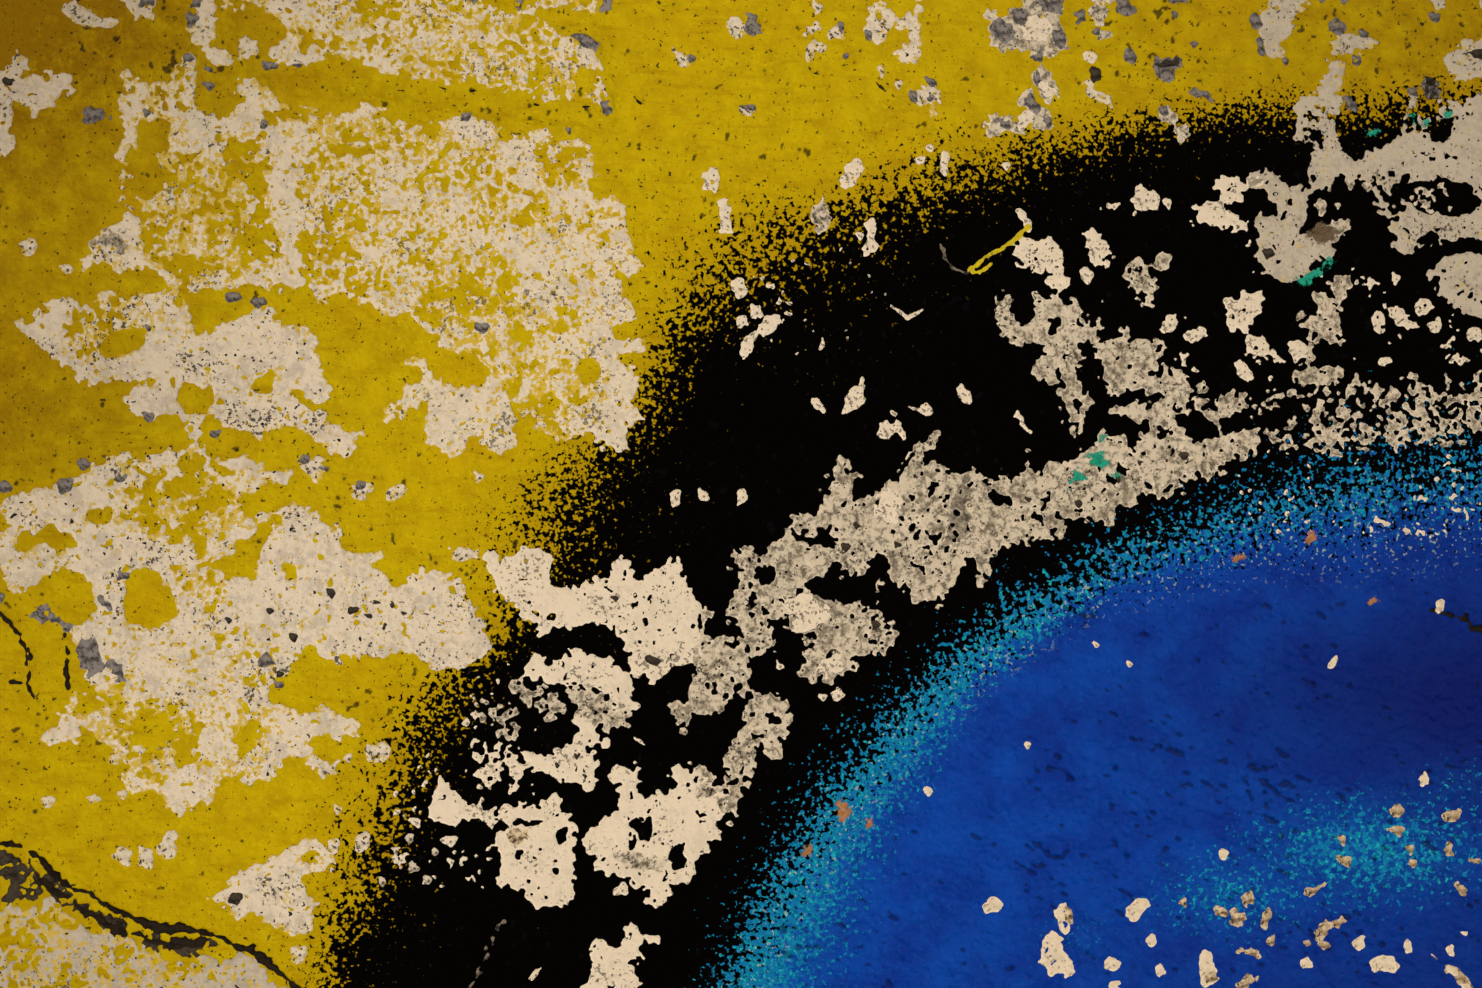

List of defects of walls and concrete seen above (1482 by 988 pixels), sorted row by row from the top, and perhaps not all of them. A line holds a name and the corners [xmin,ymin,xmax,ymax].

peeling [0,0,646,817]
peeling [391,0,1482,910]
crack [0,611,71,699]
peeling [0,850,286,988]
crack [0,840,301,988]
peeling [580,922,660,988]
peeling [1038,903,1075,979]
peeling [1126,898,1151,922]
peeling [1199,891,1275,988]
peeling [1300,916,1347,968]
peeling [1352,935,1412,973]
peeling [1431,931,1473,988]